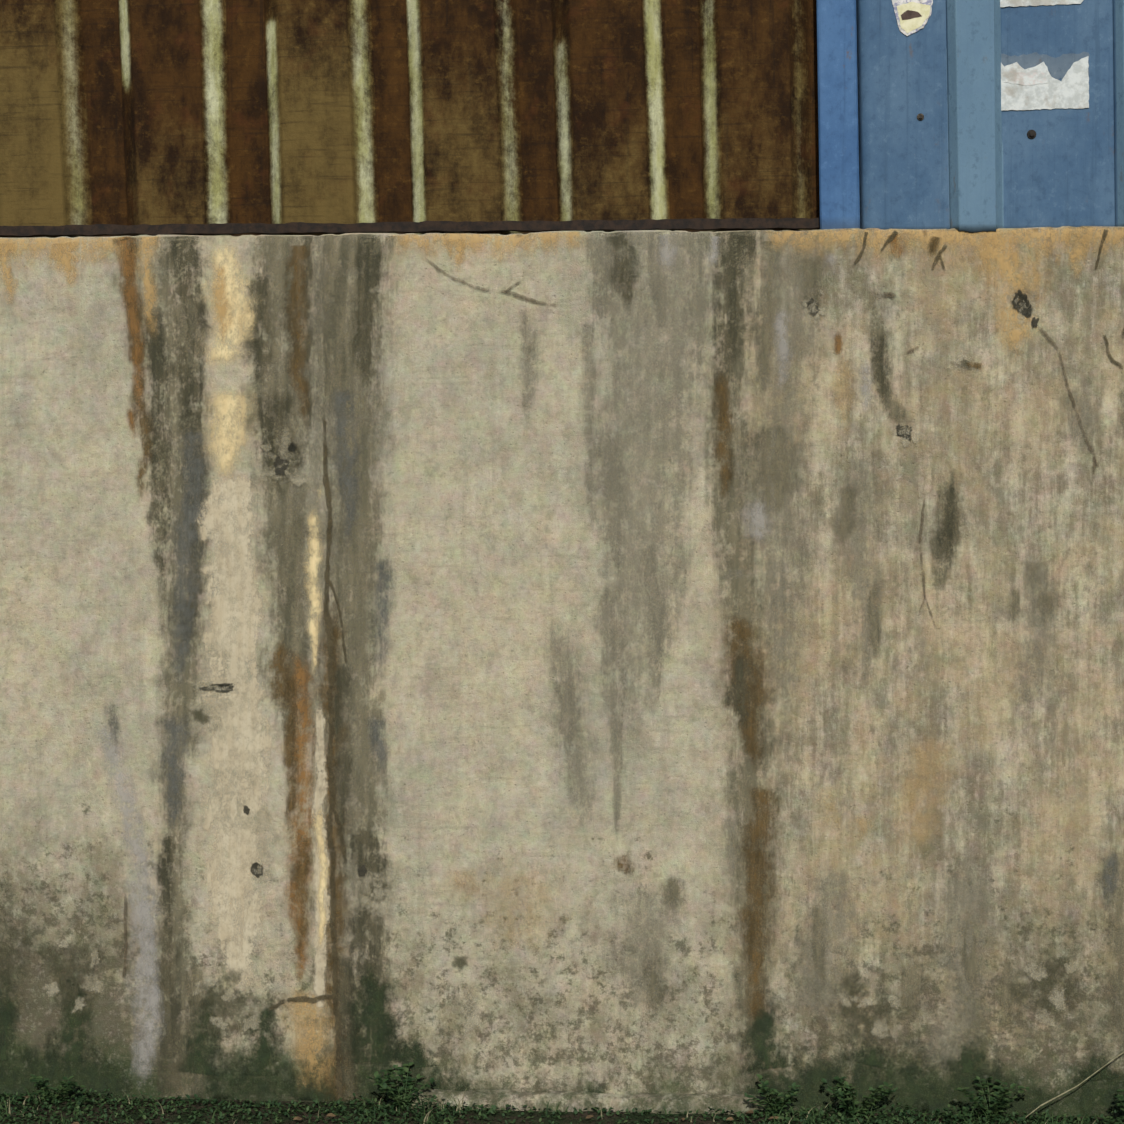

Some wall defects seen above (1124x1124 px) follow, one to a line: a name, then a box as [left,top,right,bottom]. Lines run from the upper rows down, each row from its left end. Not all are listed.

rust [0,236,156,489]
water stain [103,234,433,1101]
rust [284,660,312,976]
crack [269,419,347,1101]
water stain [585,231,822,1073]
water stain [933,472,962,584]
crack [1040,328,1099,474]
water stain [55,978,92,1062]